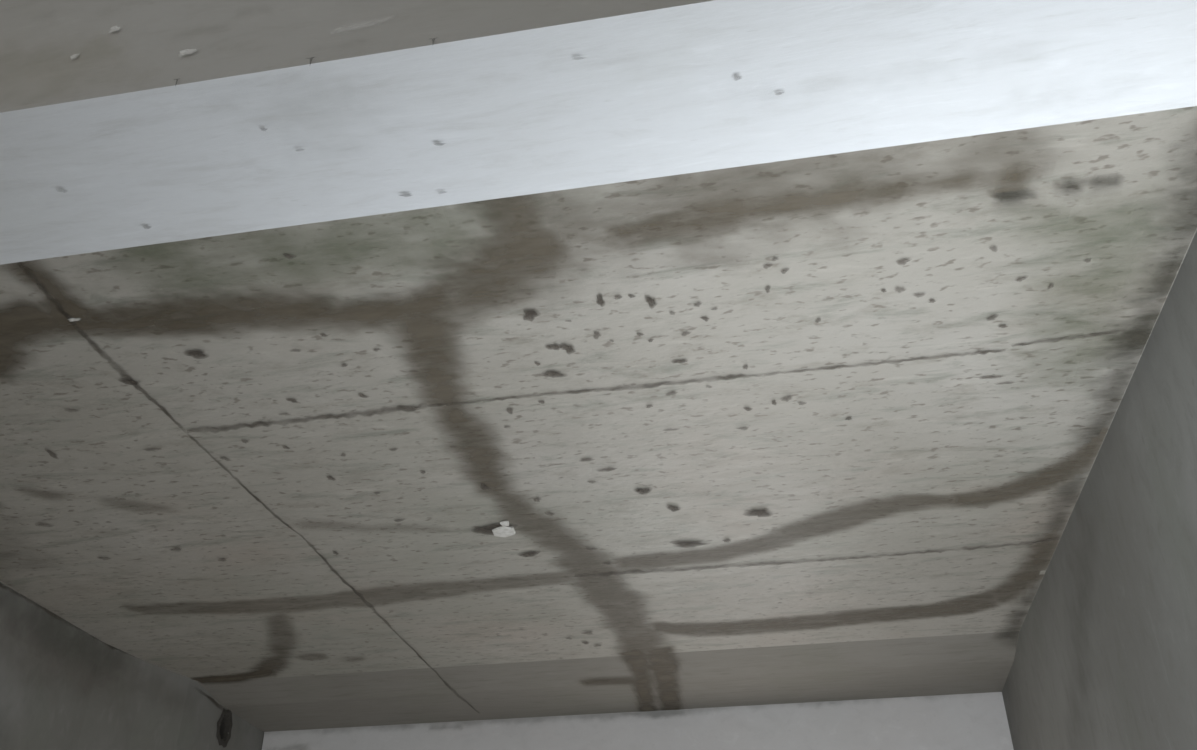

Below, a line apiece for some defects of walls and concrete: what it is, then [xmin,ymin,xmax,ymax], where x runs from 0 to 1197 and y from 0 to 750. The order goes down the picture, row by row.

leakage [927,174,974,187]
leakage [995,164,1028,201]
leakage [608,180,910,245]
crack [978,332,1113,354]
leakage [1118,315,1159,350]
crack [795,358,925,372]
crack [125,376,176,423]
crack [221,404,441,430]
crack [489,375,745,401]
leakage [0,194,1109,712]
crack [219,463,291,528]
crack [315,550,359,595]